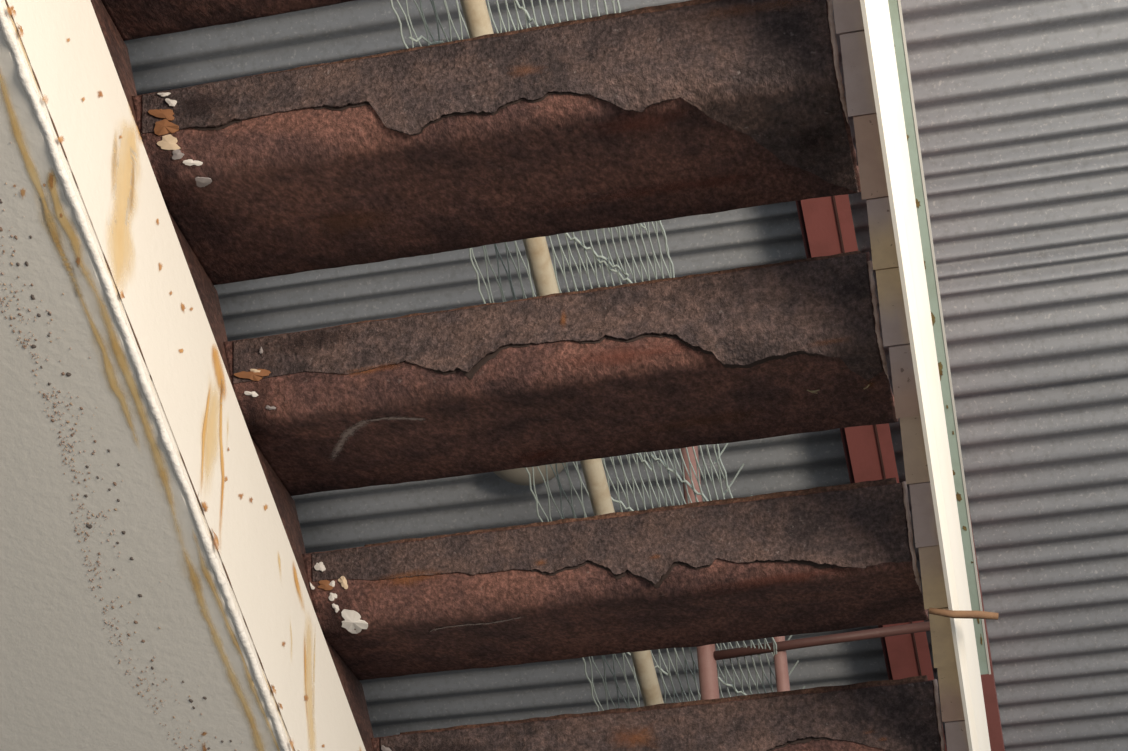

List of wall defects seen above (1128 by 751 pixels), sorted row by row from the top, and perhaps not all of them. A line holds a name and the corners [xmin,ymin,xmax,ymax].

peeling [148,92,212,187]
rust [0,75,172,505]
damp [0,227,243,751]
rust [202,348,229,516]
rust [186,556,280,751]
rust [304,632,325,751]
peeling [310,562,368,634]